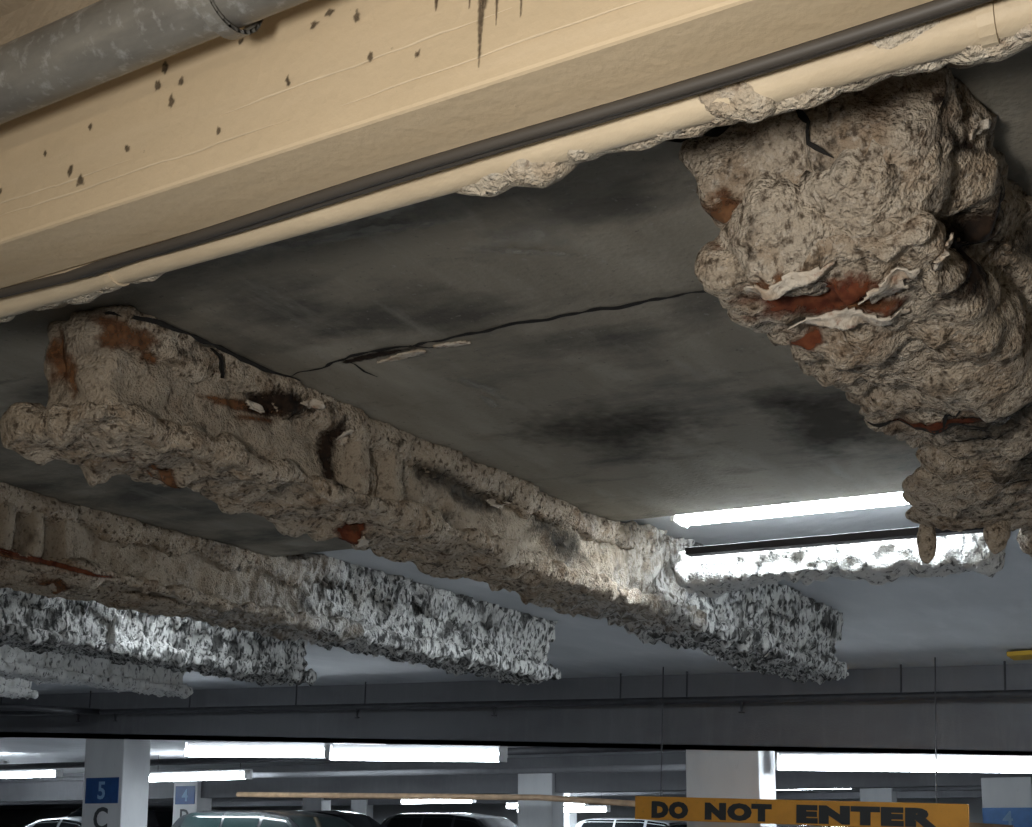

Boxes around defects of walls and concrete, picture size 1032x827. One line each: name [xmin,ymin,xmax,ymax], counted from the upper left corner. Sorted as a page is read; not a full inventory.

spalling [955,118,991,154]
spalling [929,185,1005,311]
rust [743,261,921,350]
crack [103,290,707,381]
spalling [244,391,326,418]
spalling [316,415,355,490]
spalling [415,463,510,513]
spalling [533,520,587,559]
rust [0,548,119,594]